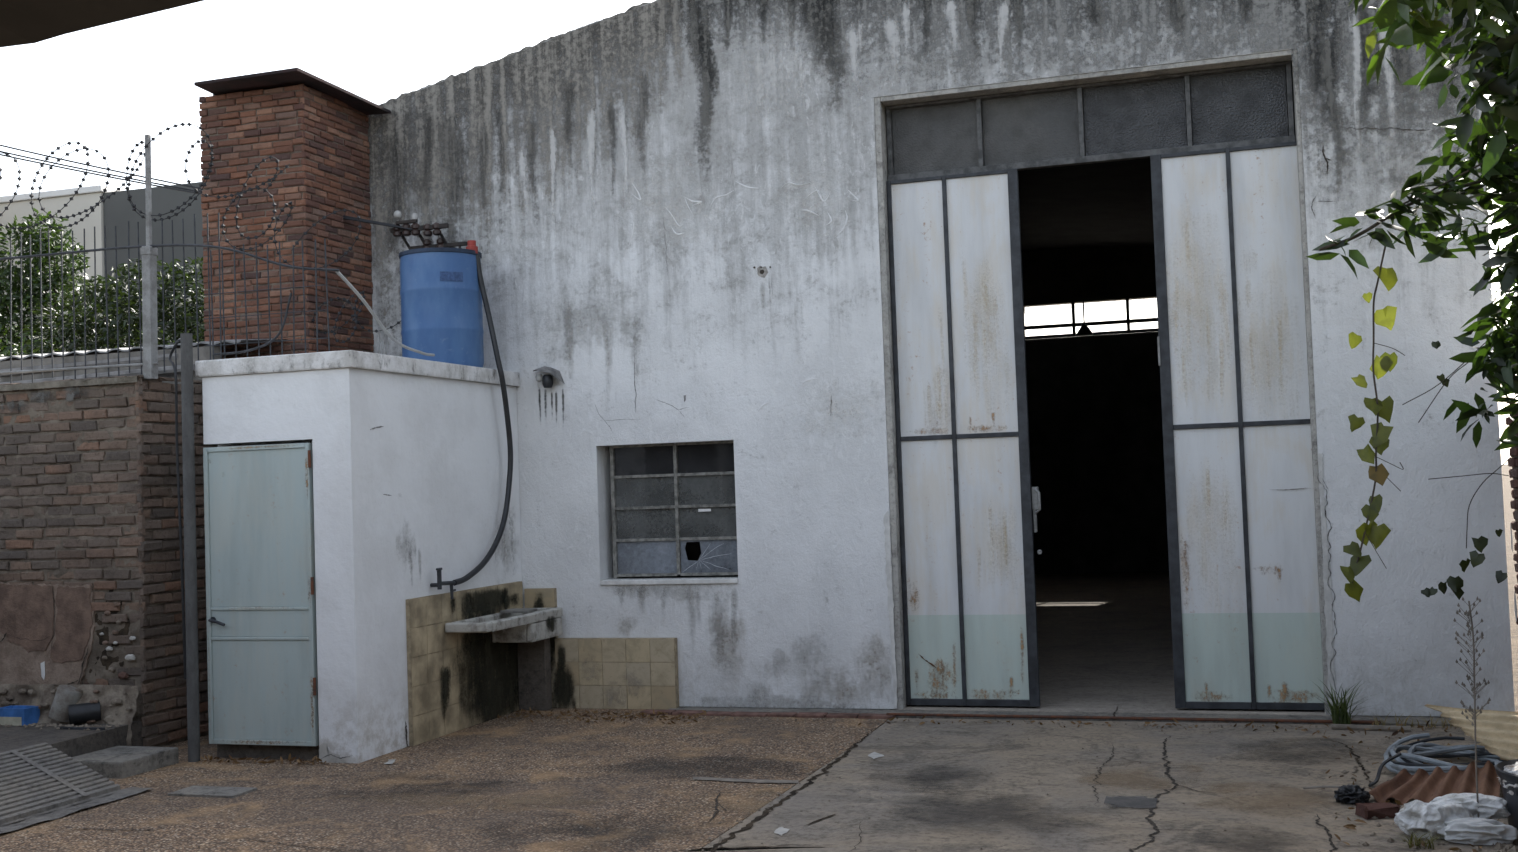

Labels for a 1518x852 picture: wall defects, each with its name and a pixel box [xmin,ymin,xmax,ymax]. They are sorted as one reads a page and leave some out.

water stain [368,0,1479,331]
flaking render [0,582,139,746]
water stain [440,588,543,723]
water stain [550,636,576,709]
crack [1092,705,1213,852]
crack [1315,815,1339,852]
crack [1335,741,1370,780]